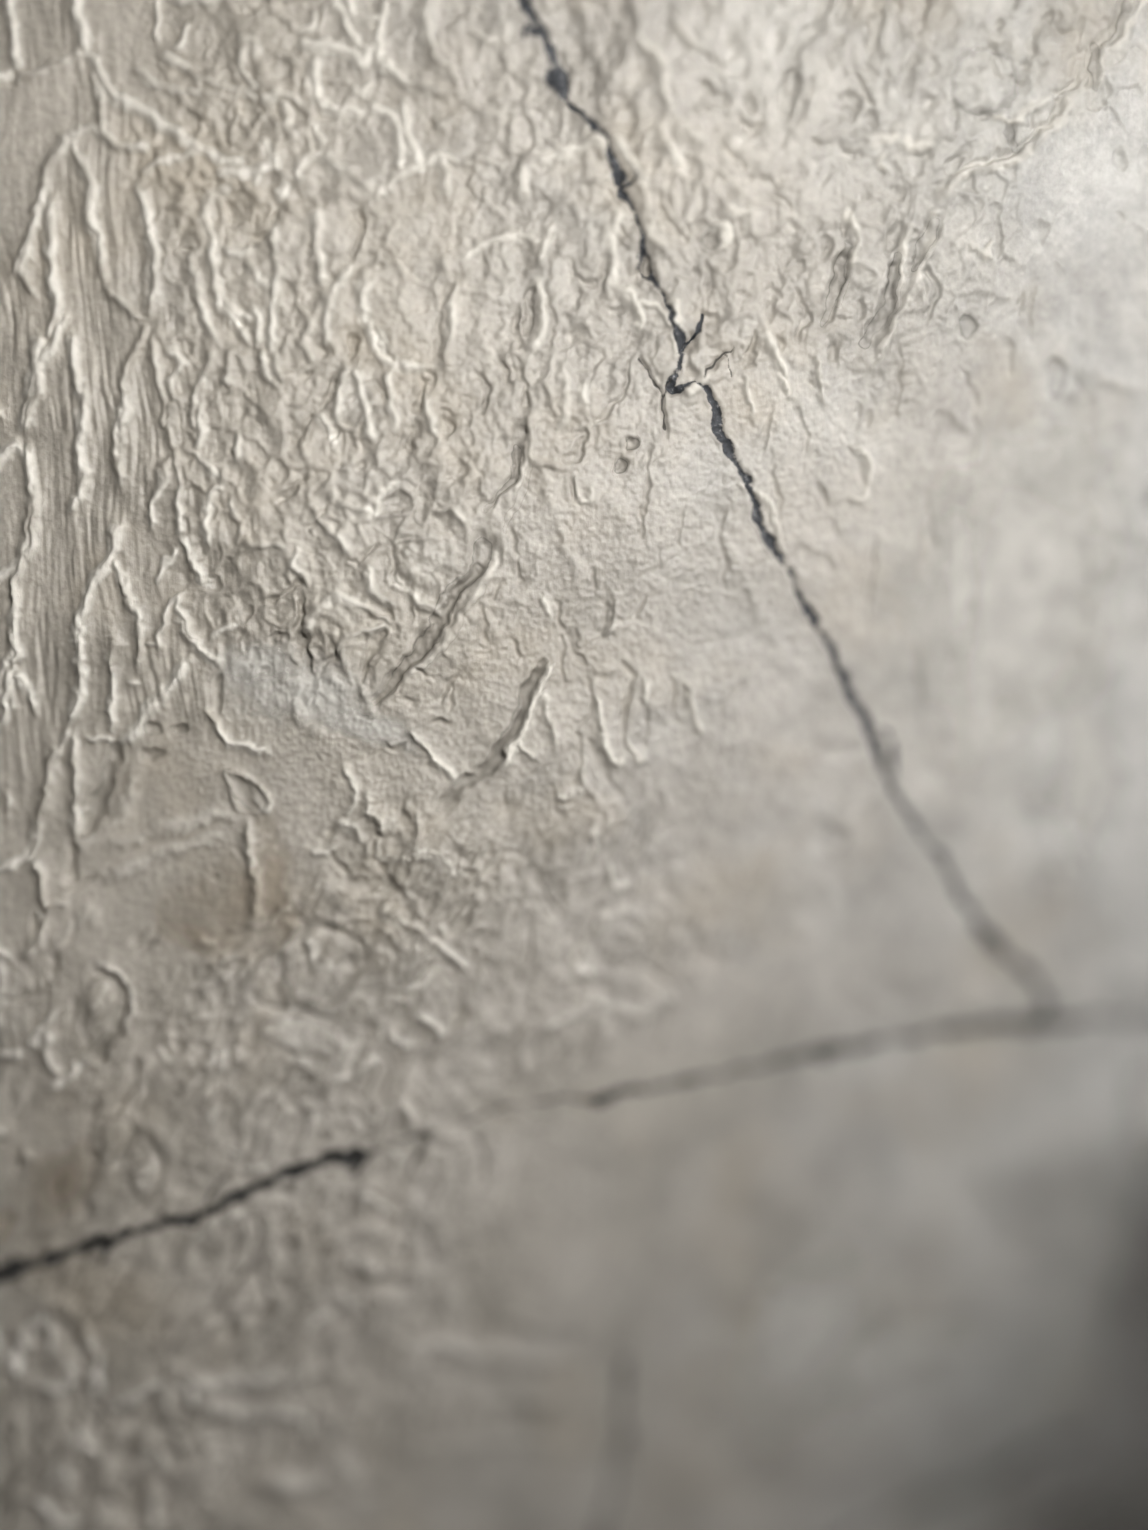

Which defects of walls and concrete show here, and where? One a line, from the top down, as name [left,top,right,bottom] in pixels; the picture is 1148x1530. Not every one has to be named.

spalling [611,435,642,478]
spalling [372,445,534,705]
crack [459,0,1137,1125]
spalling [80,721,188,838]
spalling [223,768,272,815]
spalling [436,658,557,813]
spalling [79,963,139,1066]
peeling [280,919,368,1005]
peeling [400,958,470,1058]
crack [0,1132,431,1282]